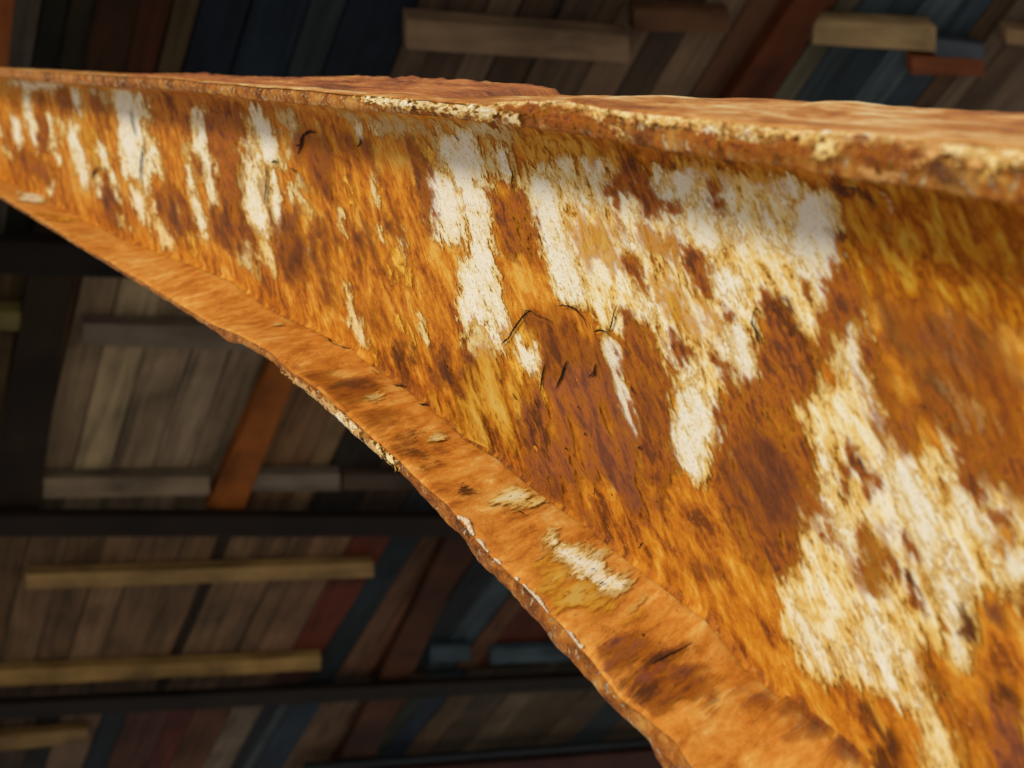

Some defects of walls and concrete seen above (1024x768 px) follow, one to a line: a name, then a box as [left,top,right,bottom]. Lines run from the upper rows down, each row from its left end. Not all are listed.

corrosion [8,85,77,190]
corrosion [95,183,120,230]
peeling [0,79,318,284]
corrosion [146,100,255,261]
corrosion [267,123,405,310]
corrosion [290,363,442,468]
peeling [333,95,1024,768]
corrosion [390,101,1024,618]
corrosion [596,627,721,715]
corrosion [778,695,905,768]
corrosion [915,644,1024,768]
corrosion [956,599,1006,642]